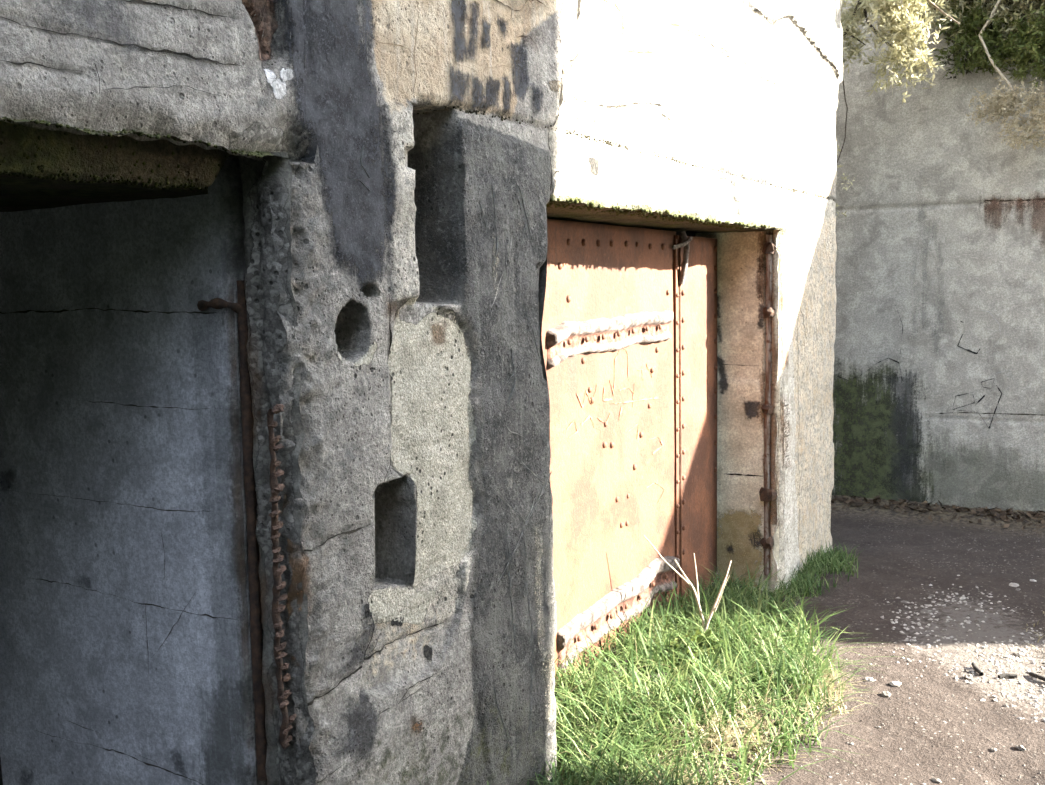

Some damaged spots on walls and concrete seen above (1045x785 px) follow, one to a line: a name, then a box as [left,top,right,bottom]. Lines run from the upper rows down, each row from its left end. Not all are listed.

crack [0,60,220,96]
crack [2,17,235,65]
crack [124,0,267,28]
water stain [450,0,543,114]
crack [548,0,840,190]
water stain [271,0,397,296]
rust [985,194,1045,243]
crack [0,307,216,315]
rust [756,230,790,526]
rust [286,538,310,627]
crack [27,577,242,682]
crack [36,720,203,785]